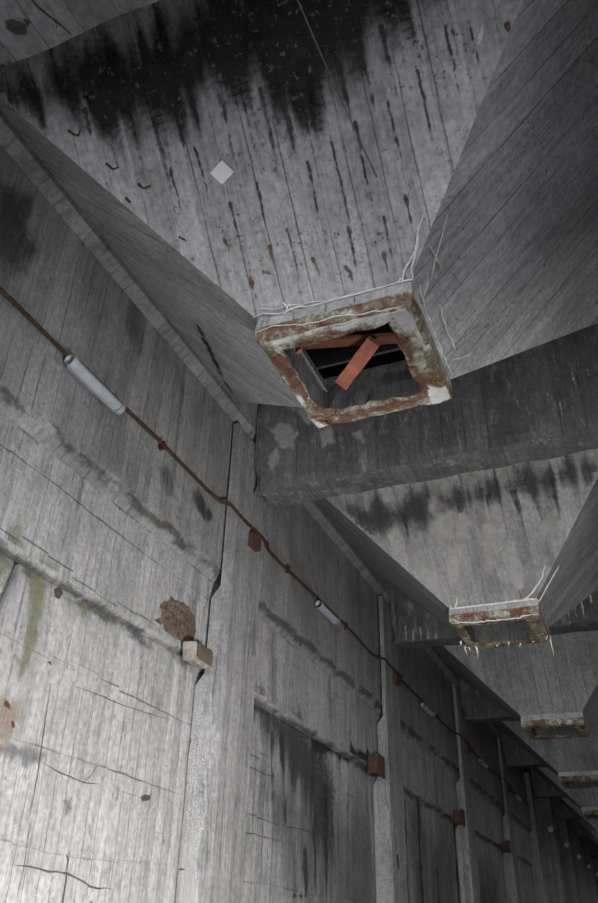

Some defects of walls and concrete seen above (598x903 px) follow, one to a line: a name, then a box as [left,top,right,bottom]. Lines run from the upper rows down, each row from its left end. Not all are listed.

leakage [0,0,424,205]
leakage [416,69,432,139]
leakage [0,184,37,271]
leakage [330,141,356,266]
rust [275,355,309,402]
rust [335,326,382,390]
leakage [195,491,213,521]
leakage [349,456,596,624]
spalling [155,596,199,644]
leakage [254,704,369,898]